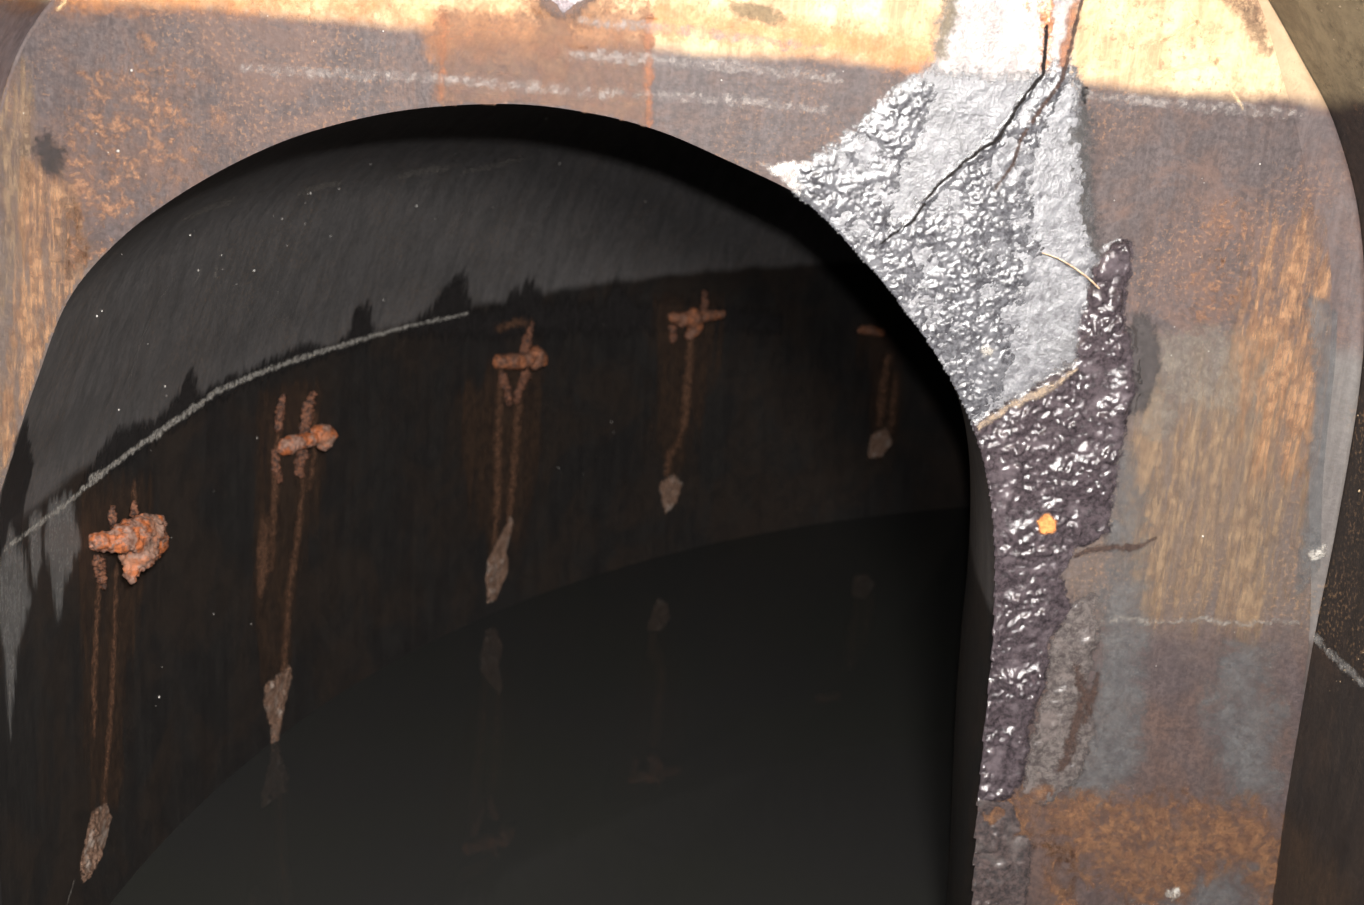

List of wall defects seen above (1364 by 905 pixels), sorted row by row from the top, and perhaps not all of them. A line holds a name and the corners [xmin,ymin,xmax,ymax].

peeling [527,0,616,34]
crack [880,0,1083,244]
rust [1023,0,1079,70]
rust [496,318,535,354]
rust [107,483,139,529]
rust [256,390,318,744]
rust [485,368,532,603]
spalling [793,59,1138,905]
rust [68,554,119,901]